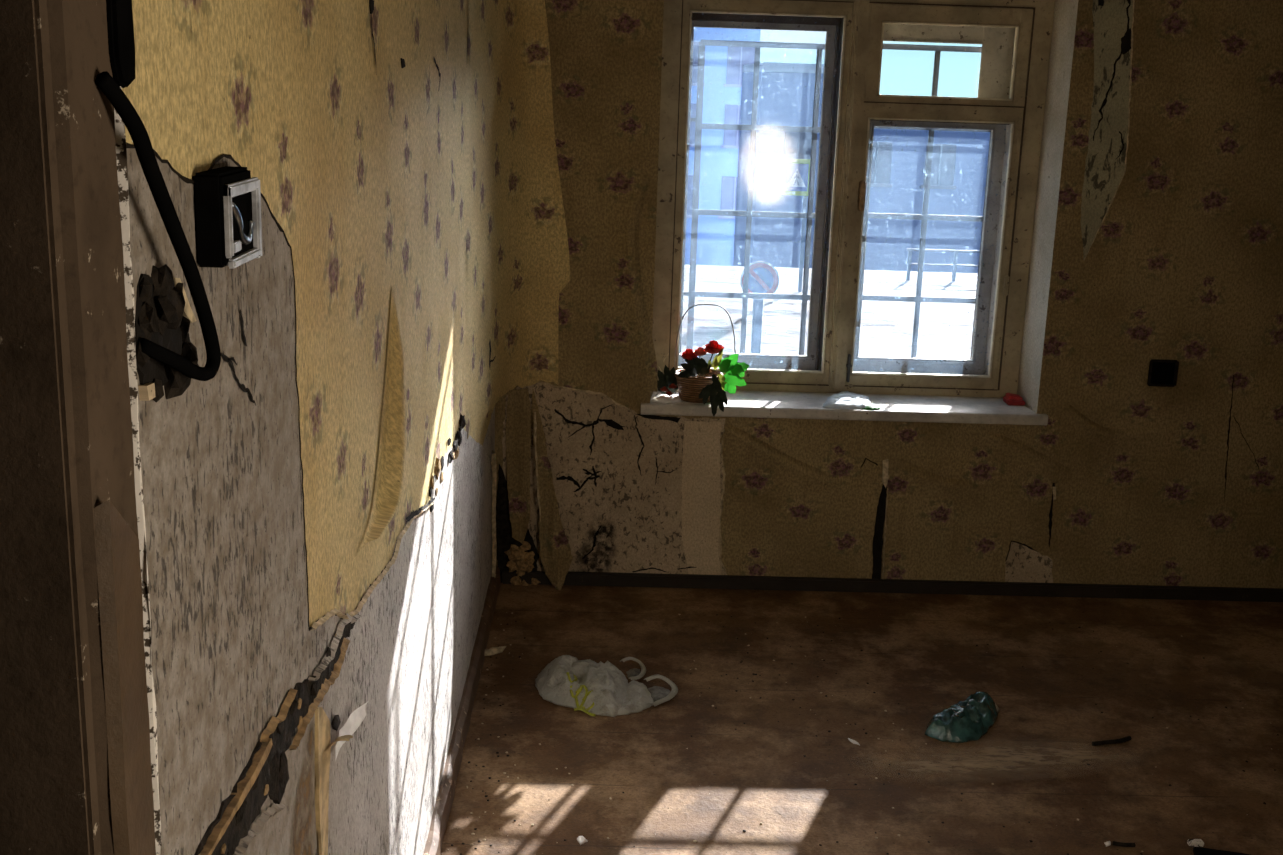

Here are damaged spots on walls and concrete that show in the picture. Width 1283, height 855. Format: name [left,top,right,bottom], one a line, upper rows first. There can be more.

peeling [1081,0,1135,260]
peeling [126,142,727,855]
crack [555,404,675,492]